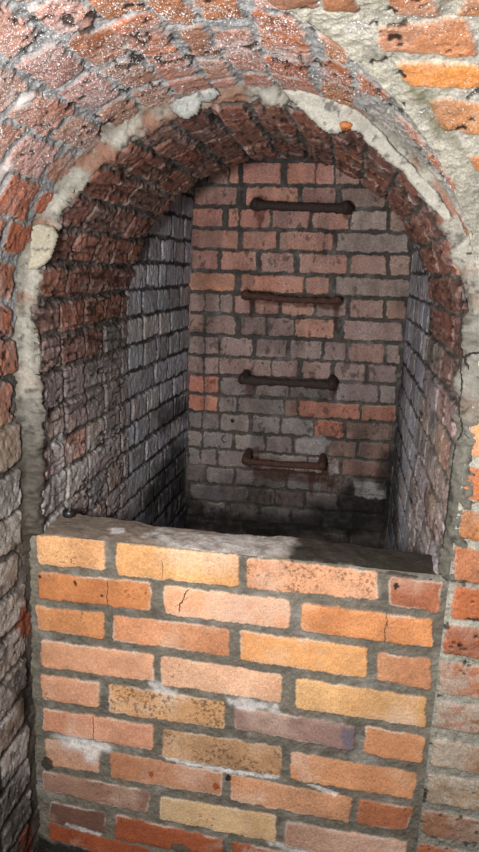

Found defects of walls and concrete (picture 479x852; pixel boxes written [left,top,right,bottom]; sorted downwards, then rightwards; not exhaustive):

peeling [28,224,59,270]
crack [442,292,479,547]